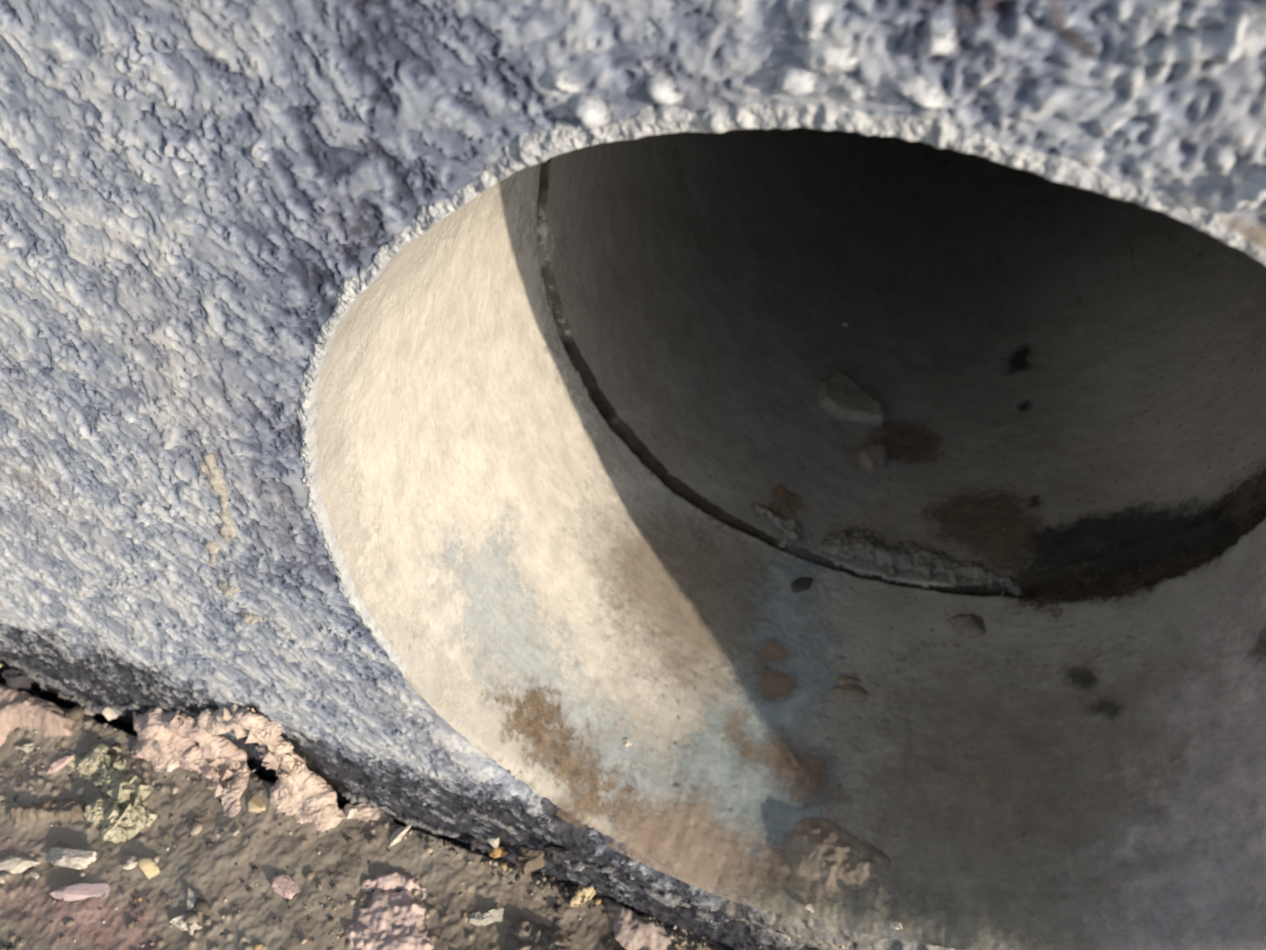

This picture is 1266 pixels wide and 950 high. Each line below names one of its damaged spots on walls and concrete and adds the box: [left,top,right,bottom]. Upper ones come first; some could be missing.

leakage [1027,497,1235,575]
leakage [0,624,219,736]
leakage [219,730,278,782]
rust [496,689,638,829]
leakage [1066,545,1266,950]
leakage [275,721,817,950]